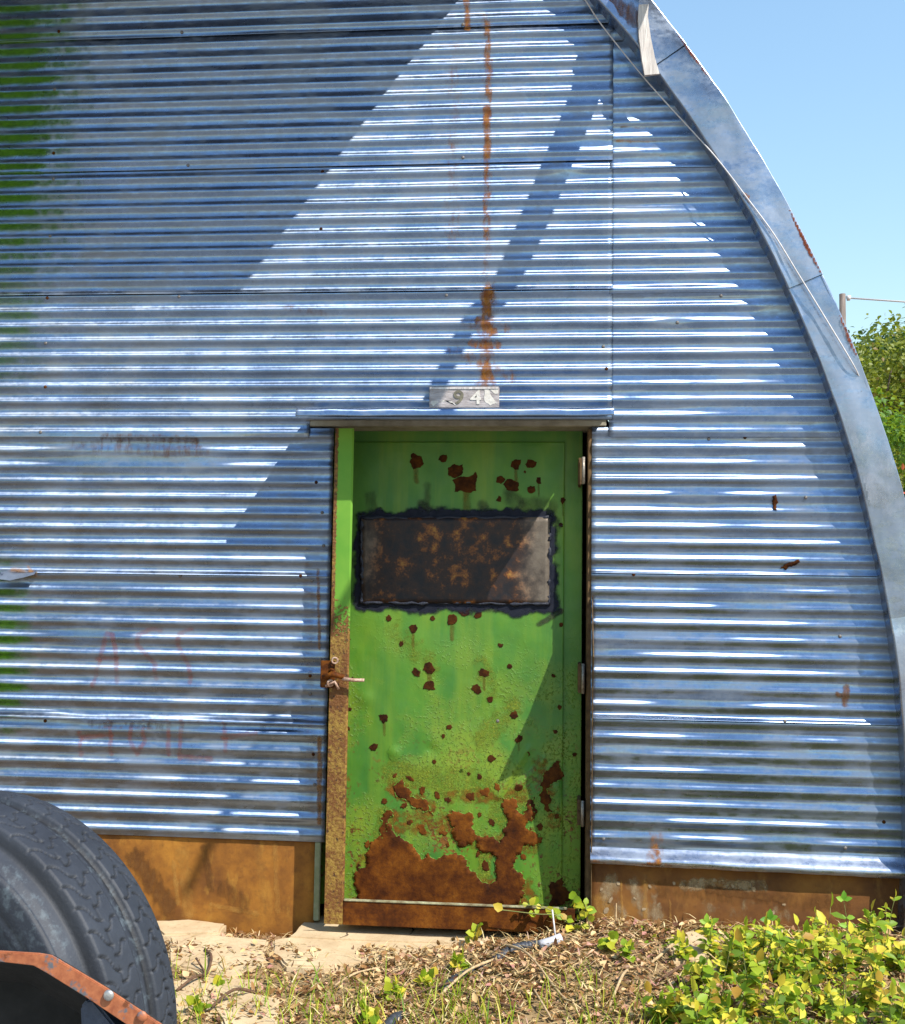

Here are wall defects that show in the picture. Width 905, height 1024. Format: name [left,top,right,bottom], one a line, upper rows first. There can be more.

rust [483,22,491,175]
rust [468,287,501,385]
rust [410,453,424,469]
rust [438,455,477,499]
rust [430,610,482,625]
rust [412,662,436,690]
rust [471,668,493,703]
rust [353,734,564,905]
rust [548,878,571,907]